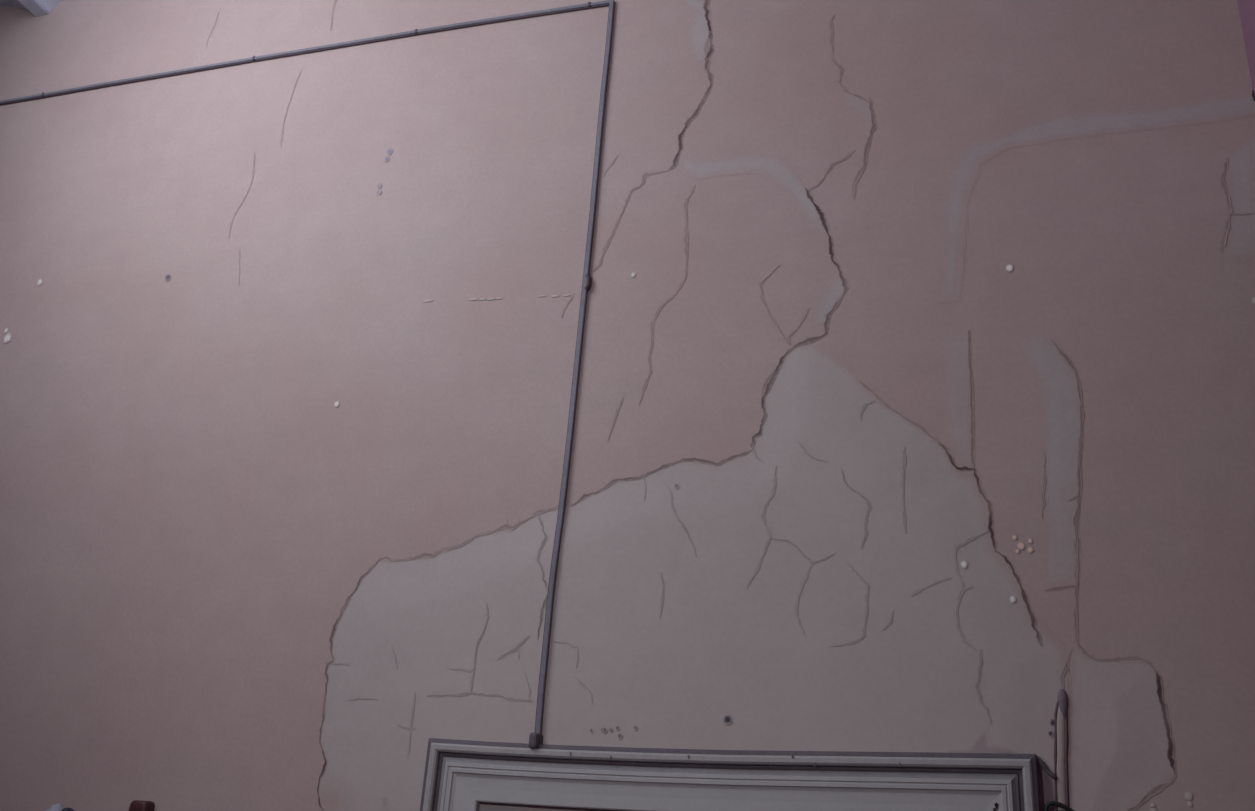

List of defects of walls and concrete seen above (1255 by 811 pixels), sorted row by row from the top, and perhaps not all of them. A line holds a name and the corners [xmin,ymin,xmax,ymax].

crack [317,0,1176,811]